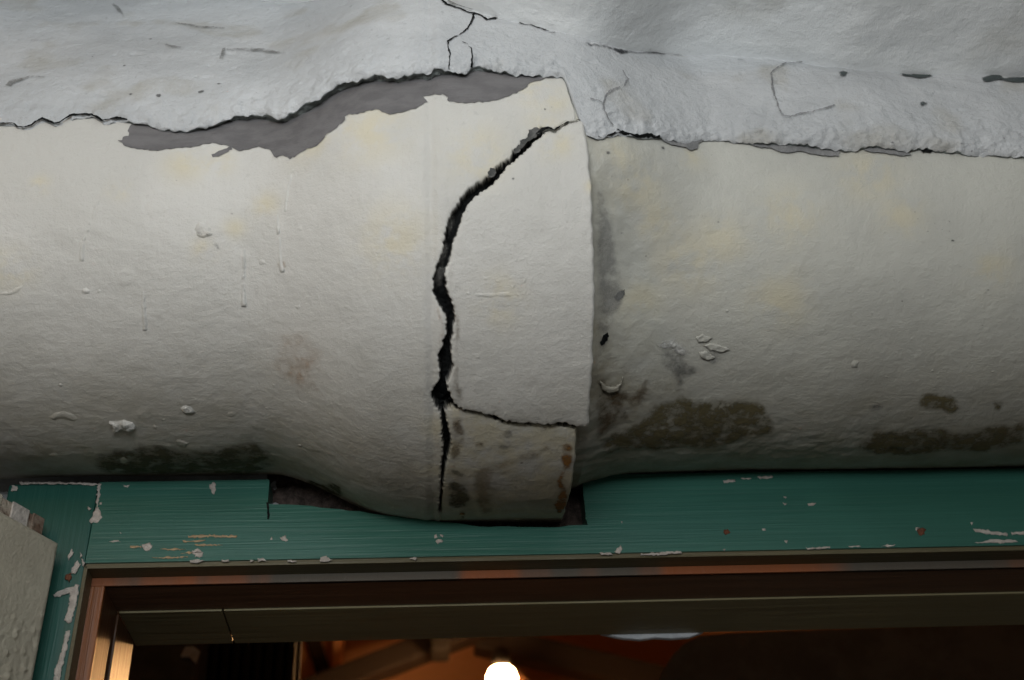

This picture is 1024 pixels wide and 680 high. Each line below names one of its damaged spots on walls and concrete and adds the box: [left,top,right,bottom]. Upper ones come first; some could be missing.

crack [442,0,551,68]
peeling [118,71,555,159]
crack [770,61,835,117]
crack [433,43,677,471]
damp [99,444,268,474]
damp [599,391,772,452]
damp [921,394,958,412]
damp [860,425,1024,455]
peeling [0,481,102,535]
peeling [109,532,237,563]
peeling [970,522,1024,544]